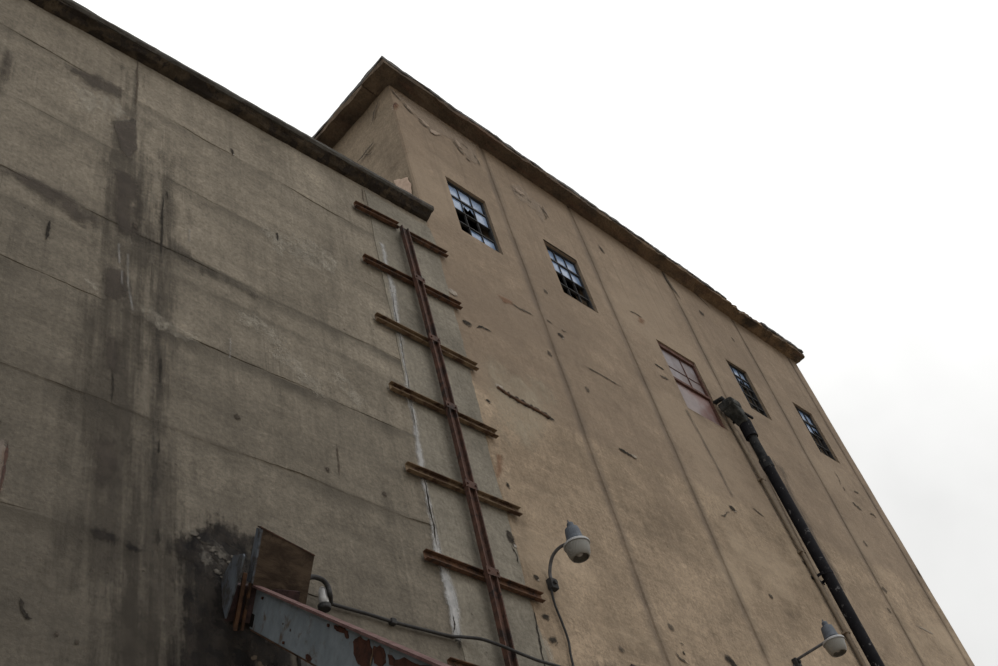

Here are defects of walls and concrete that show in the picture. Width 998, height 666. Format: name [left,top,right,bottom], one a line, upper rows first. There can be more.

peeling [394,177,412,194]
leakage [168,537,291,666]
rust [334,625,426,666]